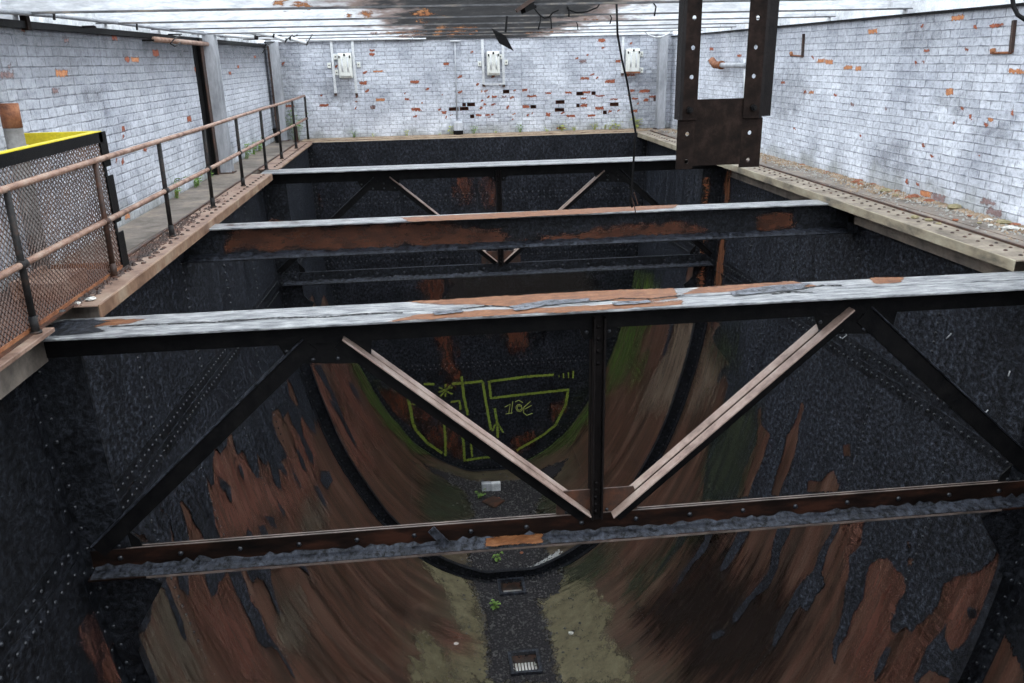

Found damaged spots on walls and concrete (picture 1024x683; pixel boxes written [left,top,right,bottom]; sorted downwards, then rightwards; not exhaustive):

corrosion [94,319,145,327]
peeling [45,253,282,336]
peeling [219,188,267,224]
corrosion [223,177,676,252]
corrosion [389,221,816,322]
peeling [723,169,793,203]
peeling [711,317,812,404]
corrosion [757,212,794,231]
peeling [714,226,982,296]
peeling [893,305,1024,439]
peeling [131,369,333,544]
peeling [832,512,997,664]